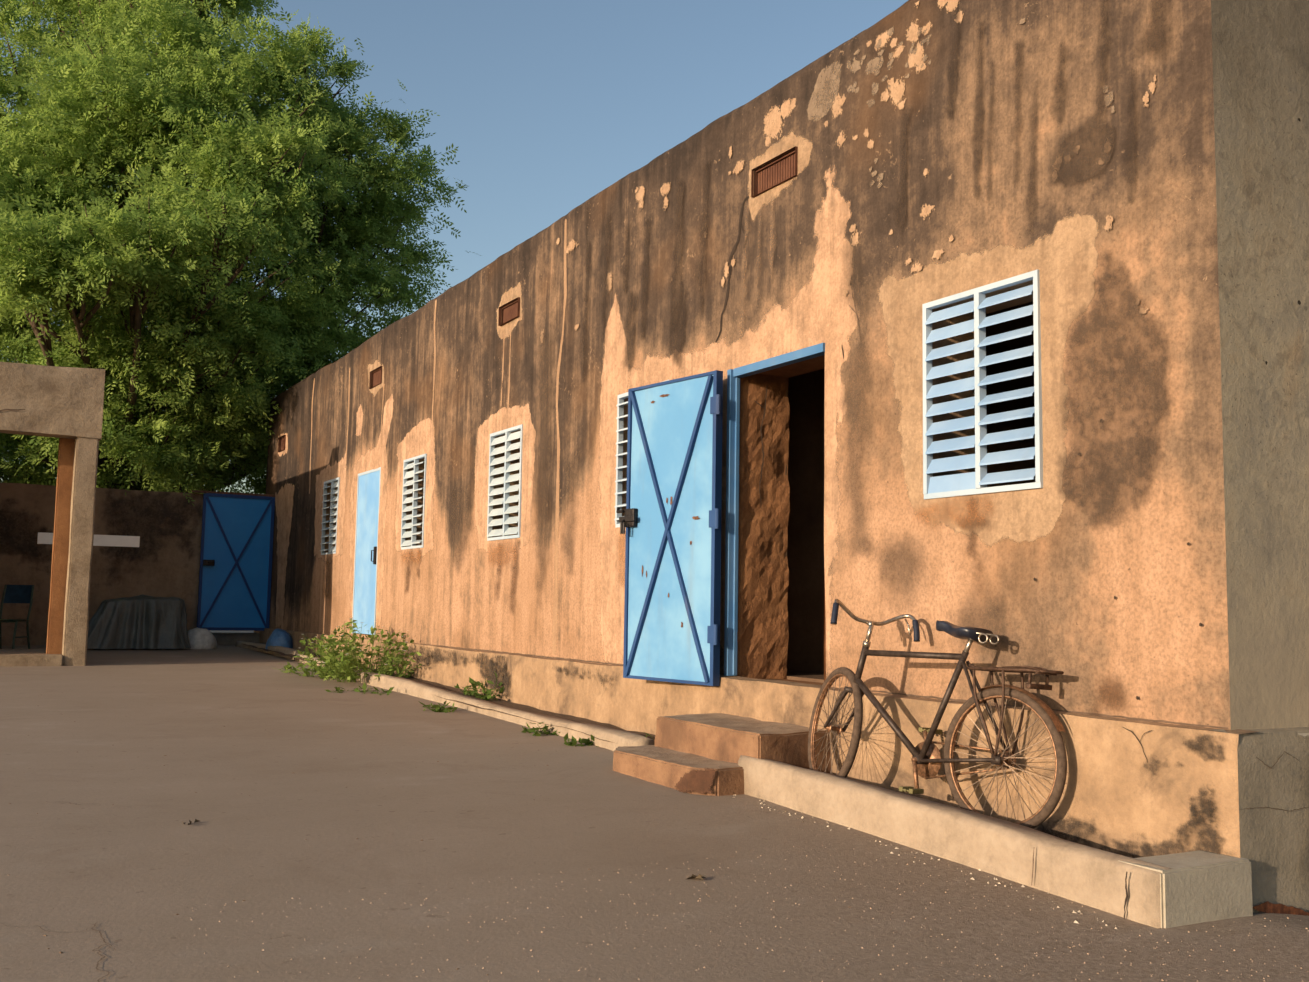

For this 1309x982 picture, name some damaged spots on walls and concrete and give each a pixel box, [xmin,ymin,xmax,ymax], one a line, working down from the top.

peeling [825,0,964,188]
damp [947,12,958,116]
damp [972,23,992,195]
damp [1015,43,1036,201]
damp [1051,0,1136,198]
damp [1145,4,1166,51]
crack [716,196,749,342]
peeling [920,204,935,220]
damp [1061,257,1168,523]
damp [0,499,47,560]
damp [1183,735,1223,761]
damp [1038,790,1221,858]